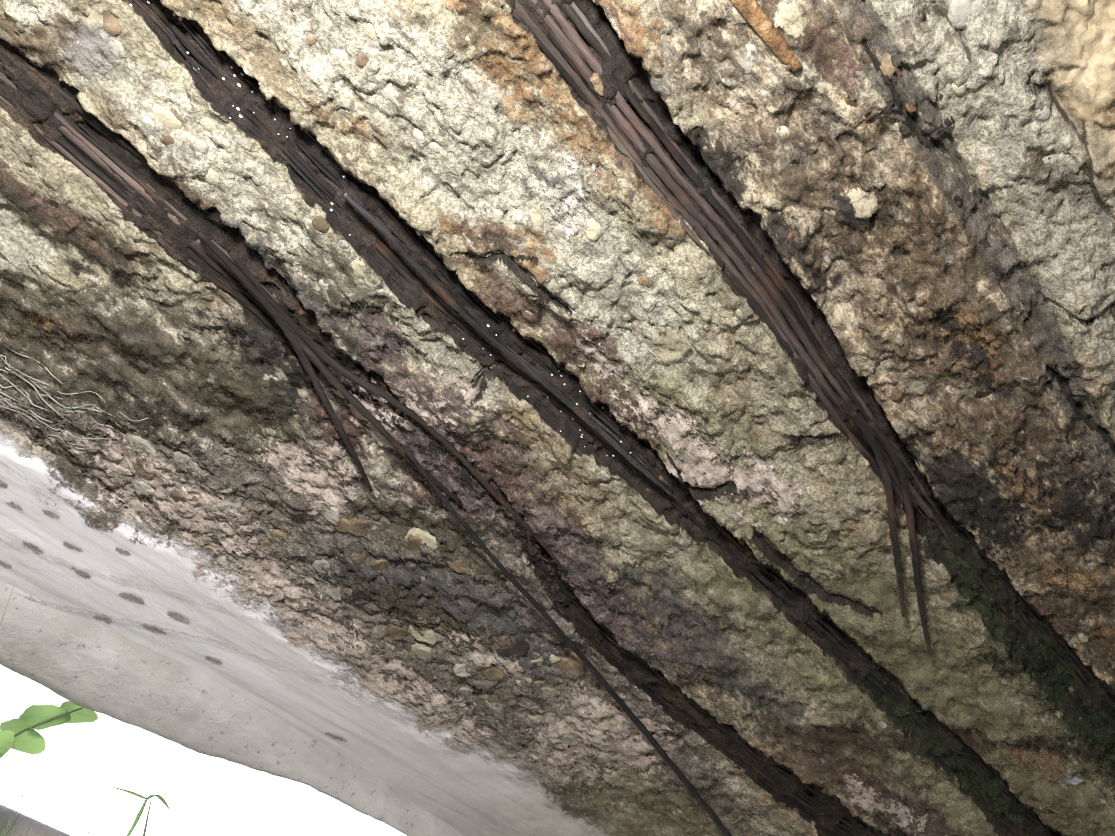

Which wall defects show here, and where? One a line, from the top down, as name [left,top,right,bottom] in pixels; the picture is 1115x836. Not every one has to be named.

peeling [774,0,810,38]
leakage [0,158,497,458]
flaking render [307,216,372,295]
crack [465,252,573,323]
rust [434,214,666,462]
rust [442,0,695,243]
spalling [634,102,846,292]
peeling [847,185,880,219]
leakage [742,115,1115,688]
crack [1028,84,1114,215]
rust [283,342,743,707]
leakage [948,725,1102,784]